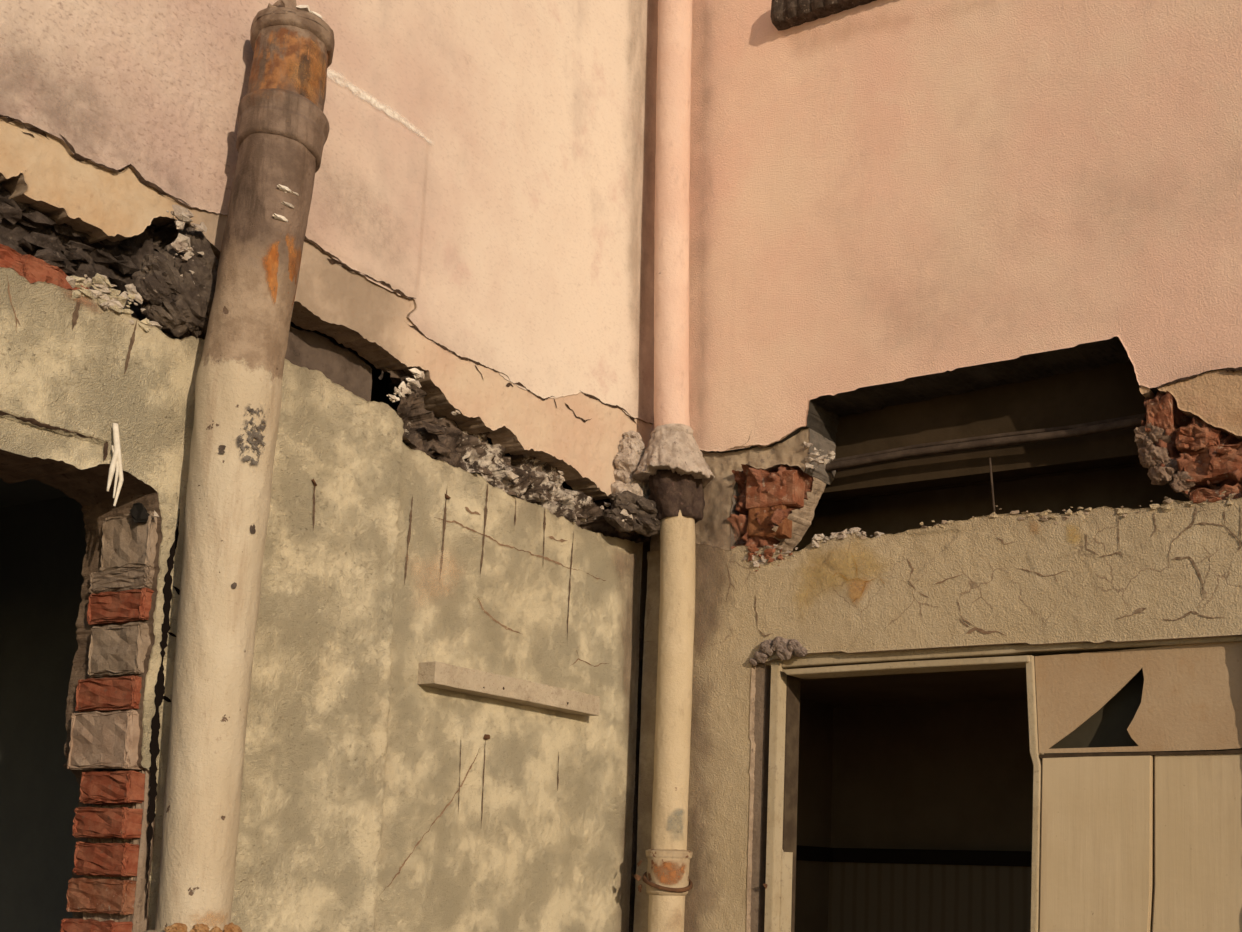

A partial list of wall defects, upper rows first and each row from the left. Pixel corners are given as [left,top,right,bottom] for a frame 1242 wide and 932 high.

flaking render [0,182,219,340]
rust [264,237,301,302]
peeling [219,406,266,465]
spalling [285,326,661,543]
crack [725,562,770,637]
spalling [727,442,884,571]
crack [832,552,974,626]
crack [993,514,1123,581]
crack [1115,506,1242,621]
spalling [1116,390,1242,518]
crack [145,509,180,917]
rust [654,862,685,884]